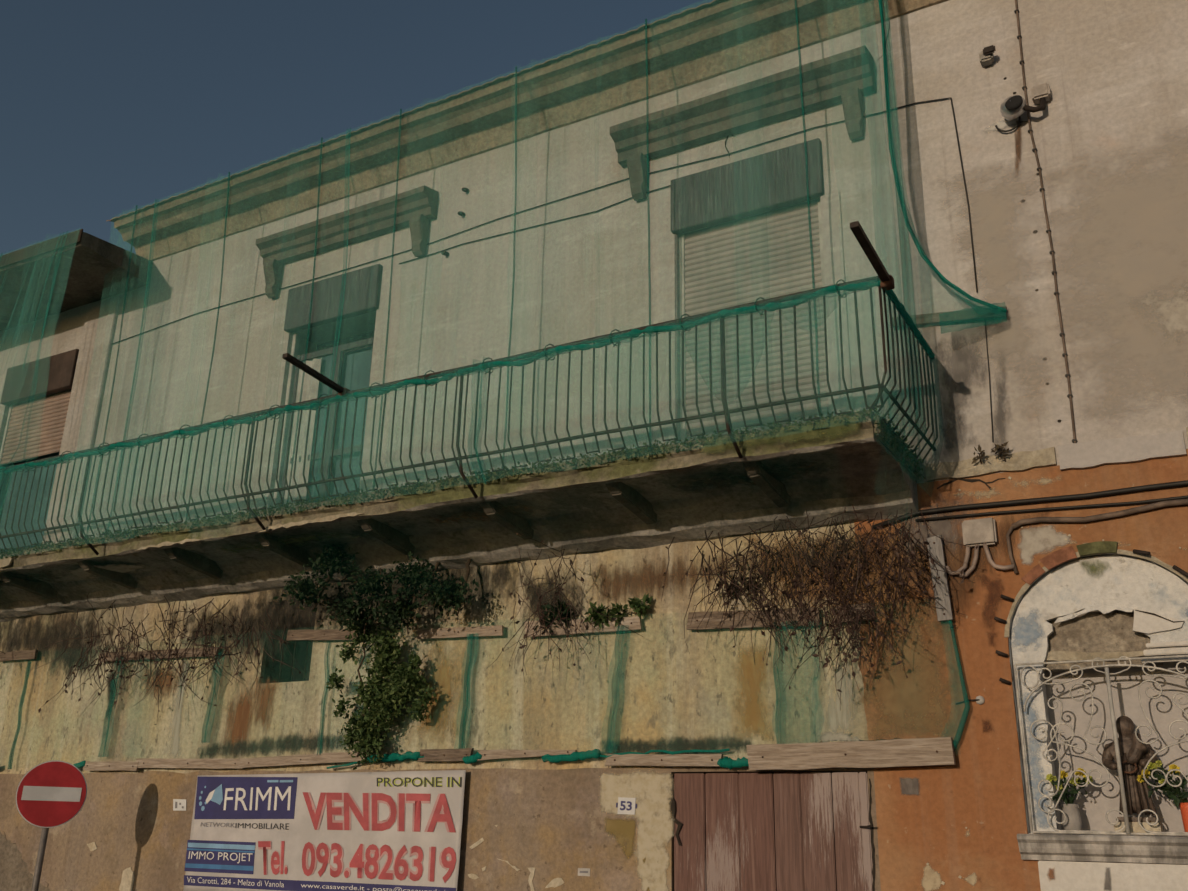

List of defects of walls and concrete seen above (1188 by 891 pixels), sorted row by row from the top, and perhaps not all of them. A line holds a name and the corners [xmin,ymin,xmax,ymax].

leakage [937,343,984,450]
leakage [995,358,1007,455]
spalling [1010,606,1188,671]
corrosion [225,679,275,746]
peeling [1020,694,1049,827]
peeling [922,863,945,891]